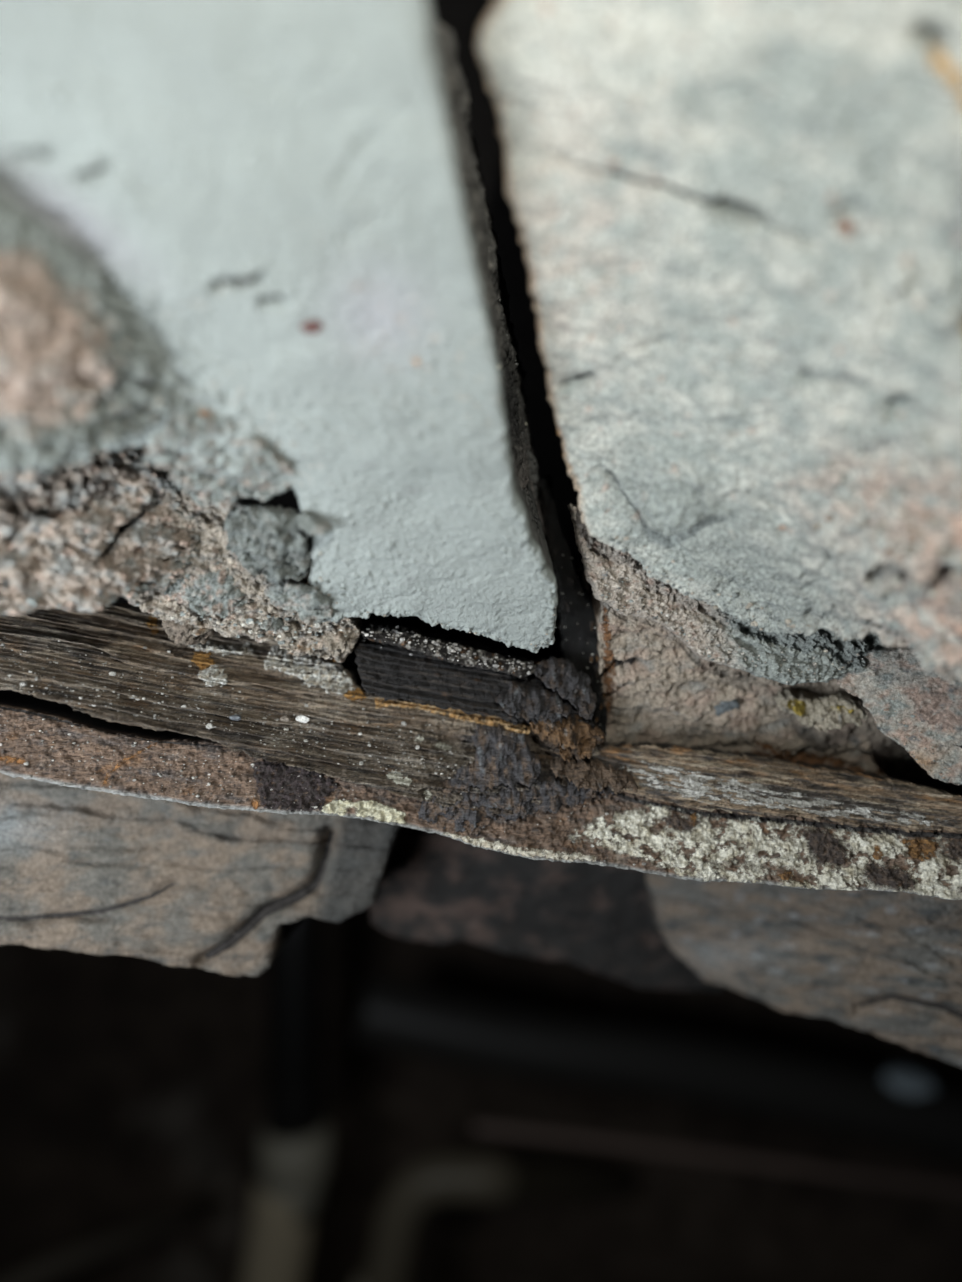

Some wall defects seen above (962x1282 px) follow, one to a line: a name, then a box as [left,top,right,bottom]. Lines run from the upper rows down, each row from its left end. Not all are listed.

spalling [0,412,362,663]
corrosion [601,607,616,716]
spalling [567,503,962,785]
corrosion [732,740,884,775]
leakage [443,760,962,900]